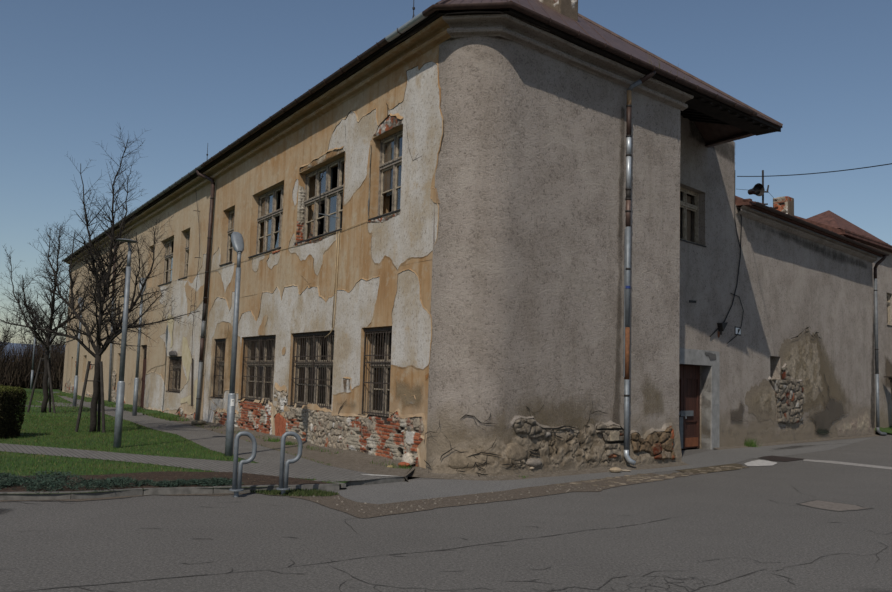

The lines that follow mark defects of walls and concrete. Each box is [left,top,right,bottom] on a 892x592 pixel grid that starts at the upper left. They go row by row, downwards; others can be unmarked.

peeling [144,60,682,476]
crack [424,403,607,477]
water stain [731,402,744,421]
peeling [745,326,823,428]